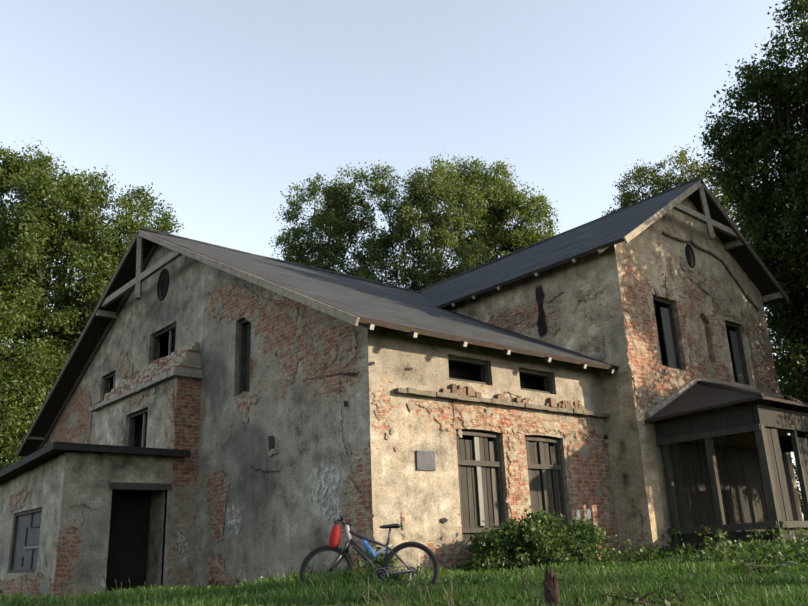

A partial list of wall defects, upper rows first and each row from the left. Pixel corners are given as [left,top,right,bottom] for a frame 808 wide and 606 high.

flaking render [204,282,309,384]
flaking render [622,272,696,405]
flaking render [53,387,91,444]
crack [302,366,365,464]
flaking render [206,470,240,543]
flaking render [406,399,617,556]
flaking render [0,540,70,598]